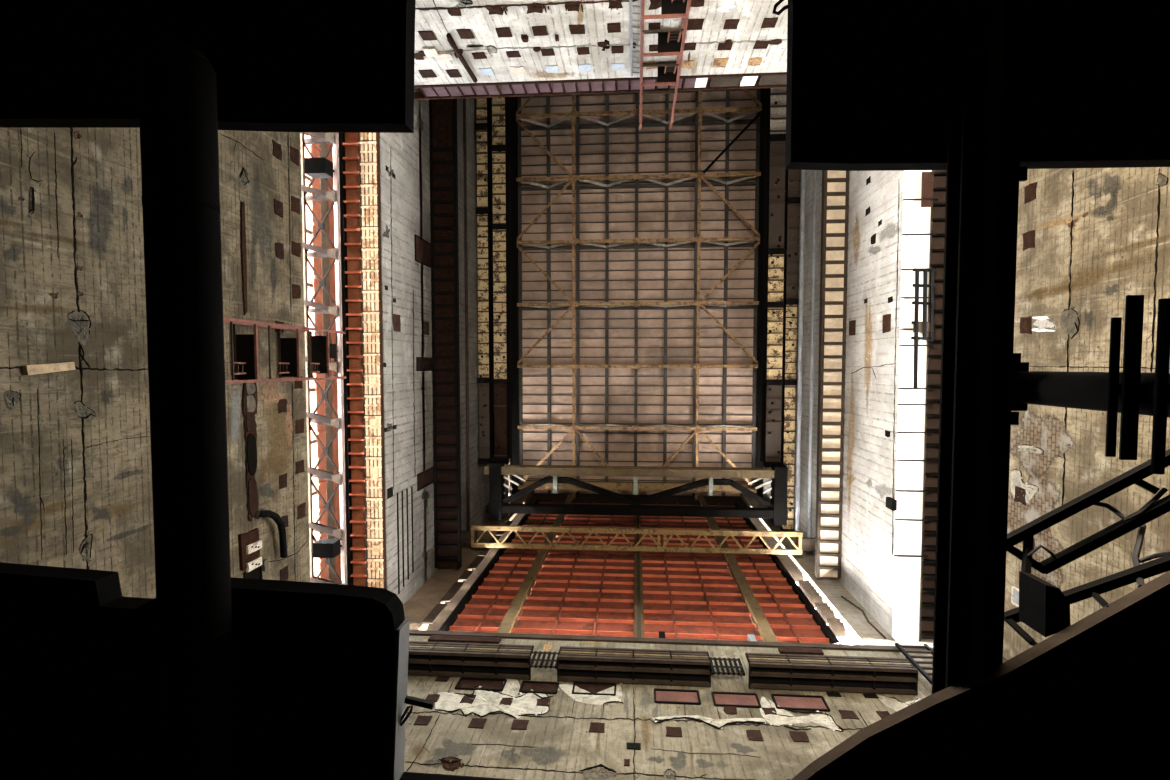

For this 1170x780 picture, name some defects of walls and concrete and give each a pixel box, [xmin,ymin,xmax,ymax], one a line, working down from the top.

crack [0,128,149,569]
crack [1029,168,1170,373]
flaking render [1007,409,1074,589]
crack [1060,407,1068,505]
peeling [435,678,624,719]
peeling [649,697,844,732]